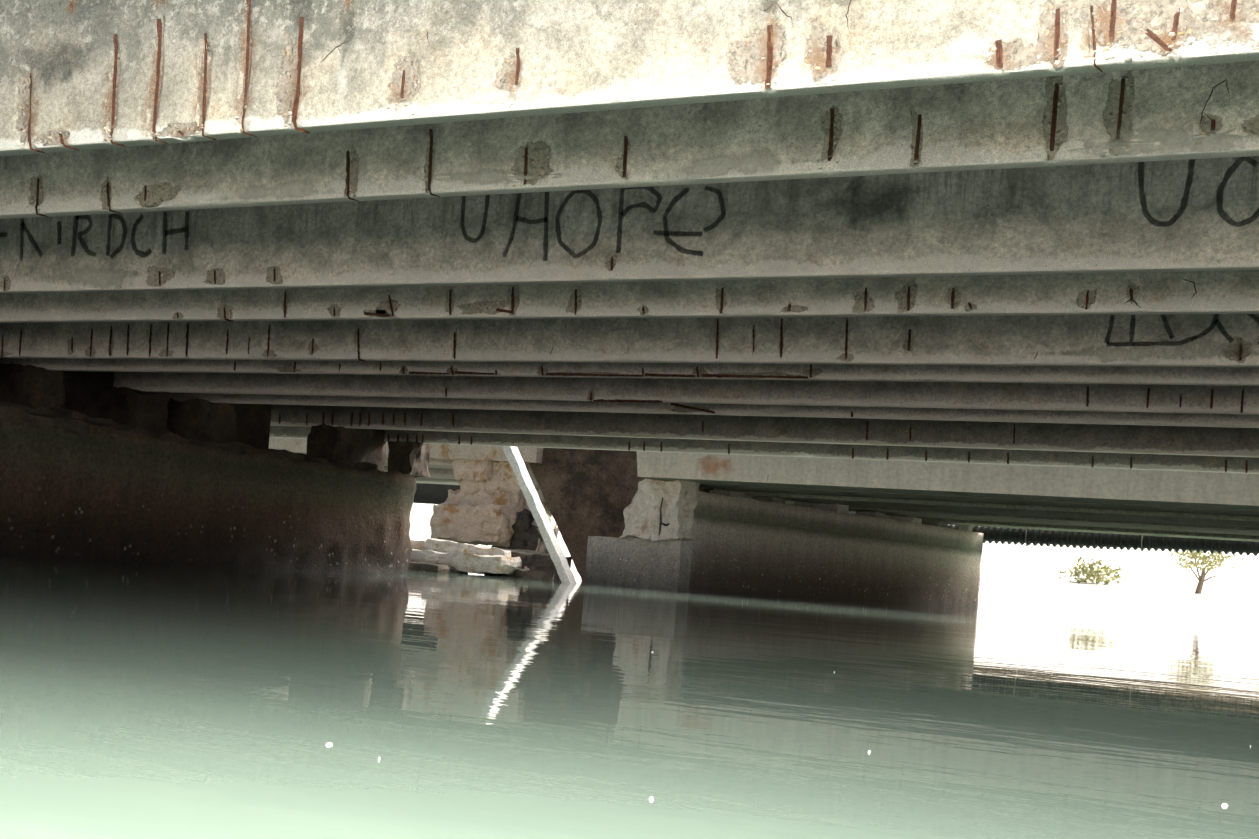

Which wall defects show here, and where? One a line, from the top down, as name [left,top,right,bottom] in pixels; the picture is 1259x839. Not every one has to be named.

spalling [984,0,1259,161]